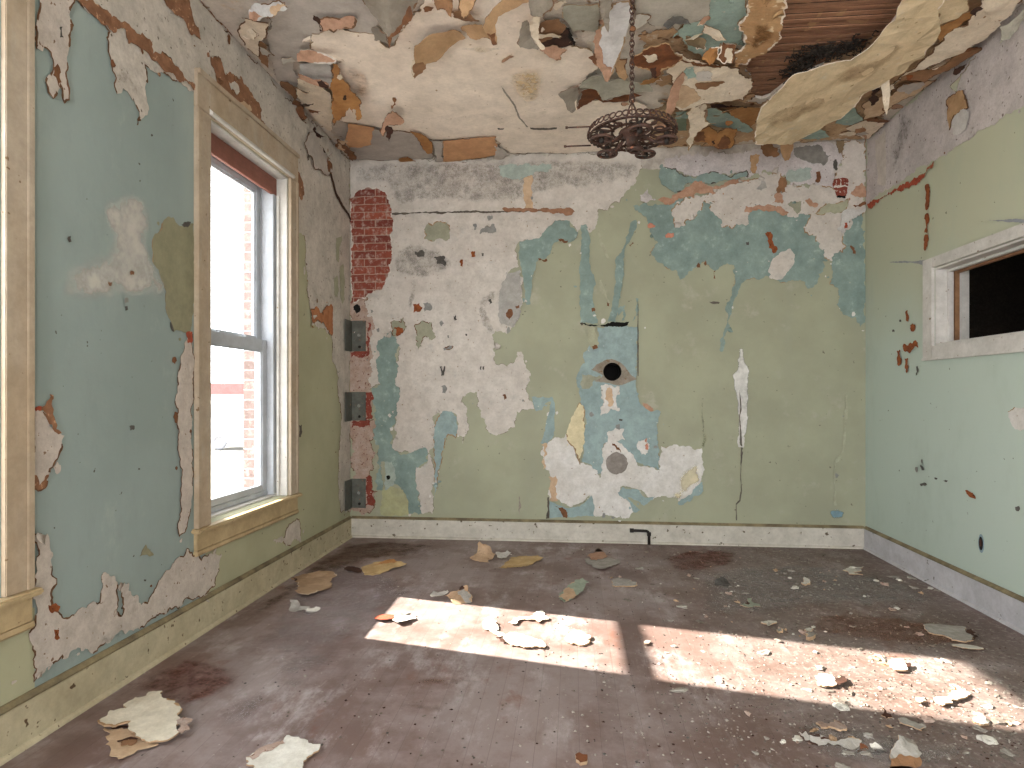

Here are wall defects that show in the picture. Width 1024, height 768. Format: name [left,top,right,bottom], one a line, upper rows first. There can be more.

crack [307,132,351,221]
crack [392,207,575,216]
flaking render [35,0,1024,522]
flaking render [29,216,222,682]
crack [736,390,745,520]